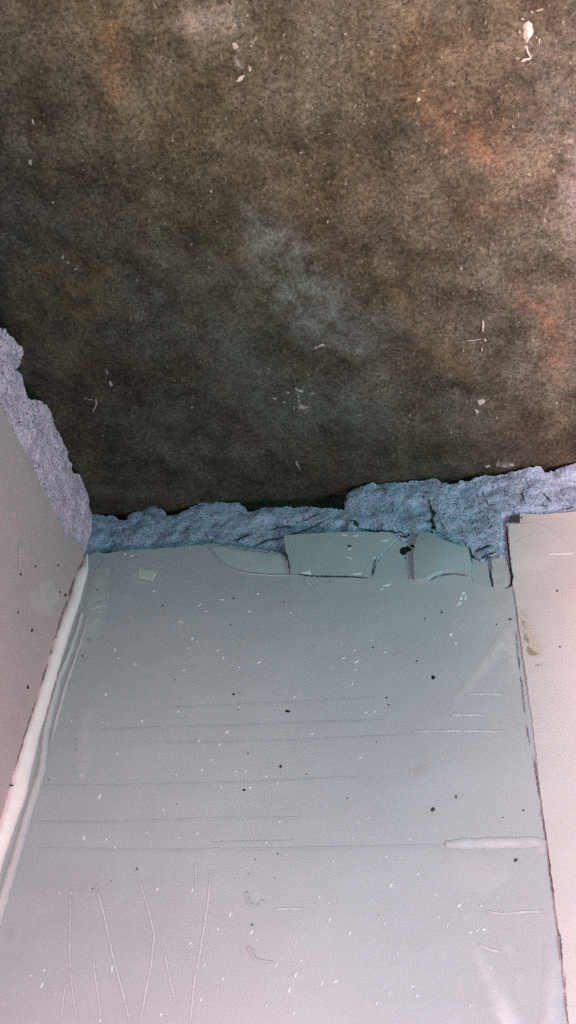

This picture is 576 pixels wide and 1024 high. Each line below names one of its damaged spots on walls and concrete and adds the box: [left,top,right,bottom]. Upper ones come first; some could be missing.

damp [156,0,258,61]
damp [191,176,424,469]
damp [528,106,576,272]
spalling [0,328,576,606]